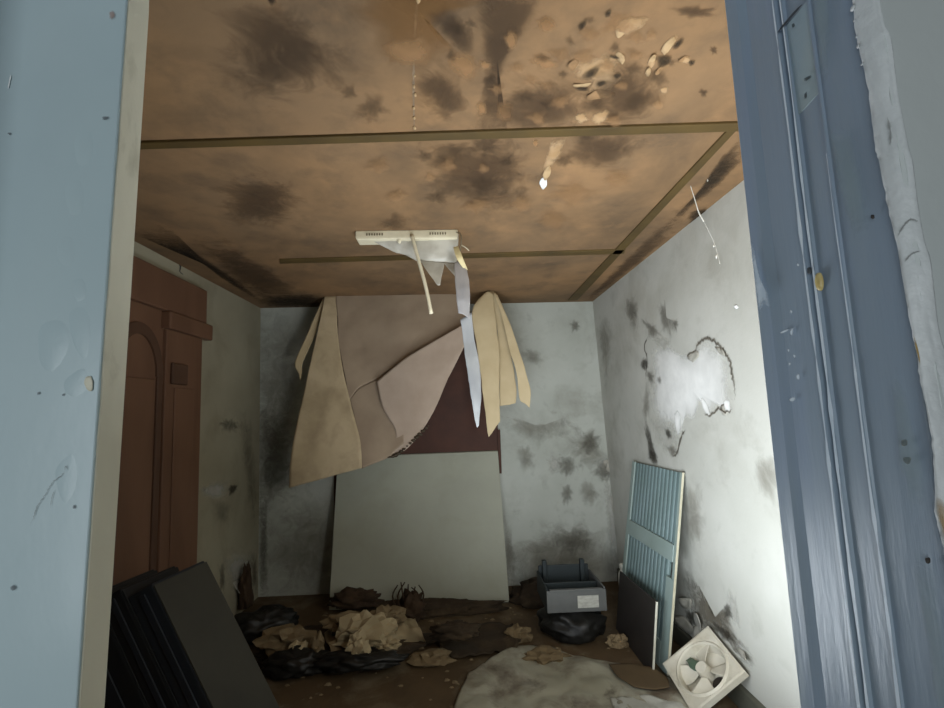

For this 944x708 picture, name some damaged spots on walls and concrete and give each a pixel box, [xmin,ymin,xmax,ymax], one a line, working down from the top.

water stain [383,0,463,63]
peeling [606,11,647,38]
water stain [489,21,515,95]
peeling [567,52,625,100]
peeling [645,37,694,77]
peeling [576,111,608,124]
water stain [686,154,733,220]
water stain [161,241,272,291]
water stain [607,249,644,283]
water stain [269,296,318,306]
peeling [644,337,734,456]
water stain [646,433,656,462]